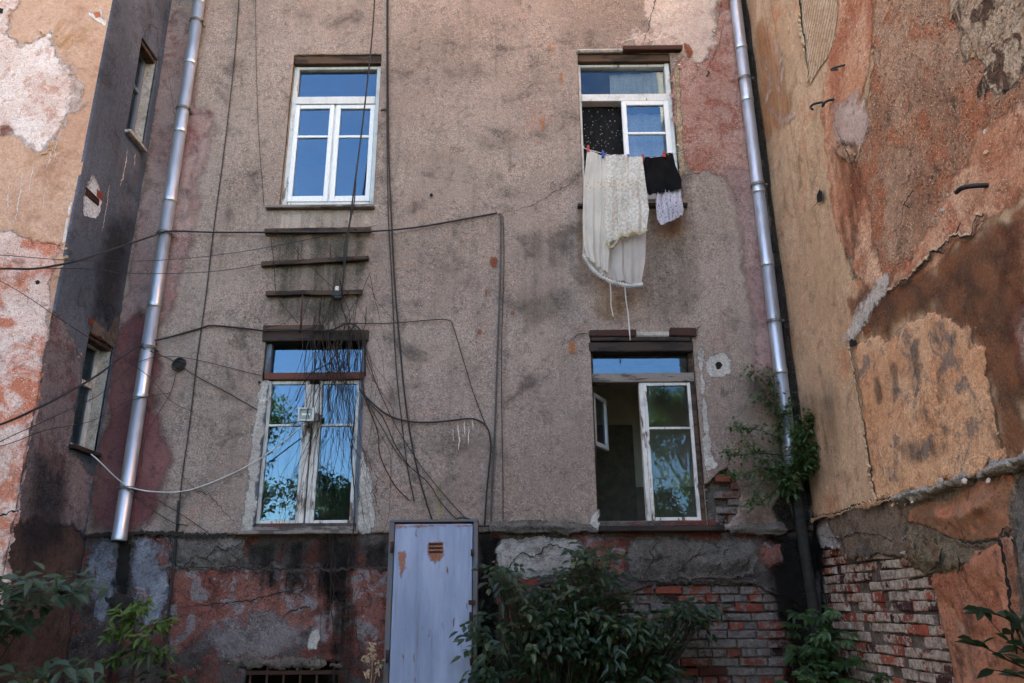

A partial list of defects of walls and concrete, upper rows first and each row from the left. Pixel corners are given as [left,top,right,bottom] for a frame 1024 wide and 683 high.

peeling [0,0,85,155]
peeling [670,0,750,176]
peeling [798,0,1024,383]
crack [886,213,984,292]
peeling [0,175,388,683]
peeling [856,311,1007,507]
crack [160,565,388,620]
rust [398,551,406,576]
rust [428,542,444,561]
flaking render [492,533,794,683]
flaking render [816,520,980,683]